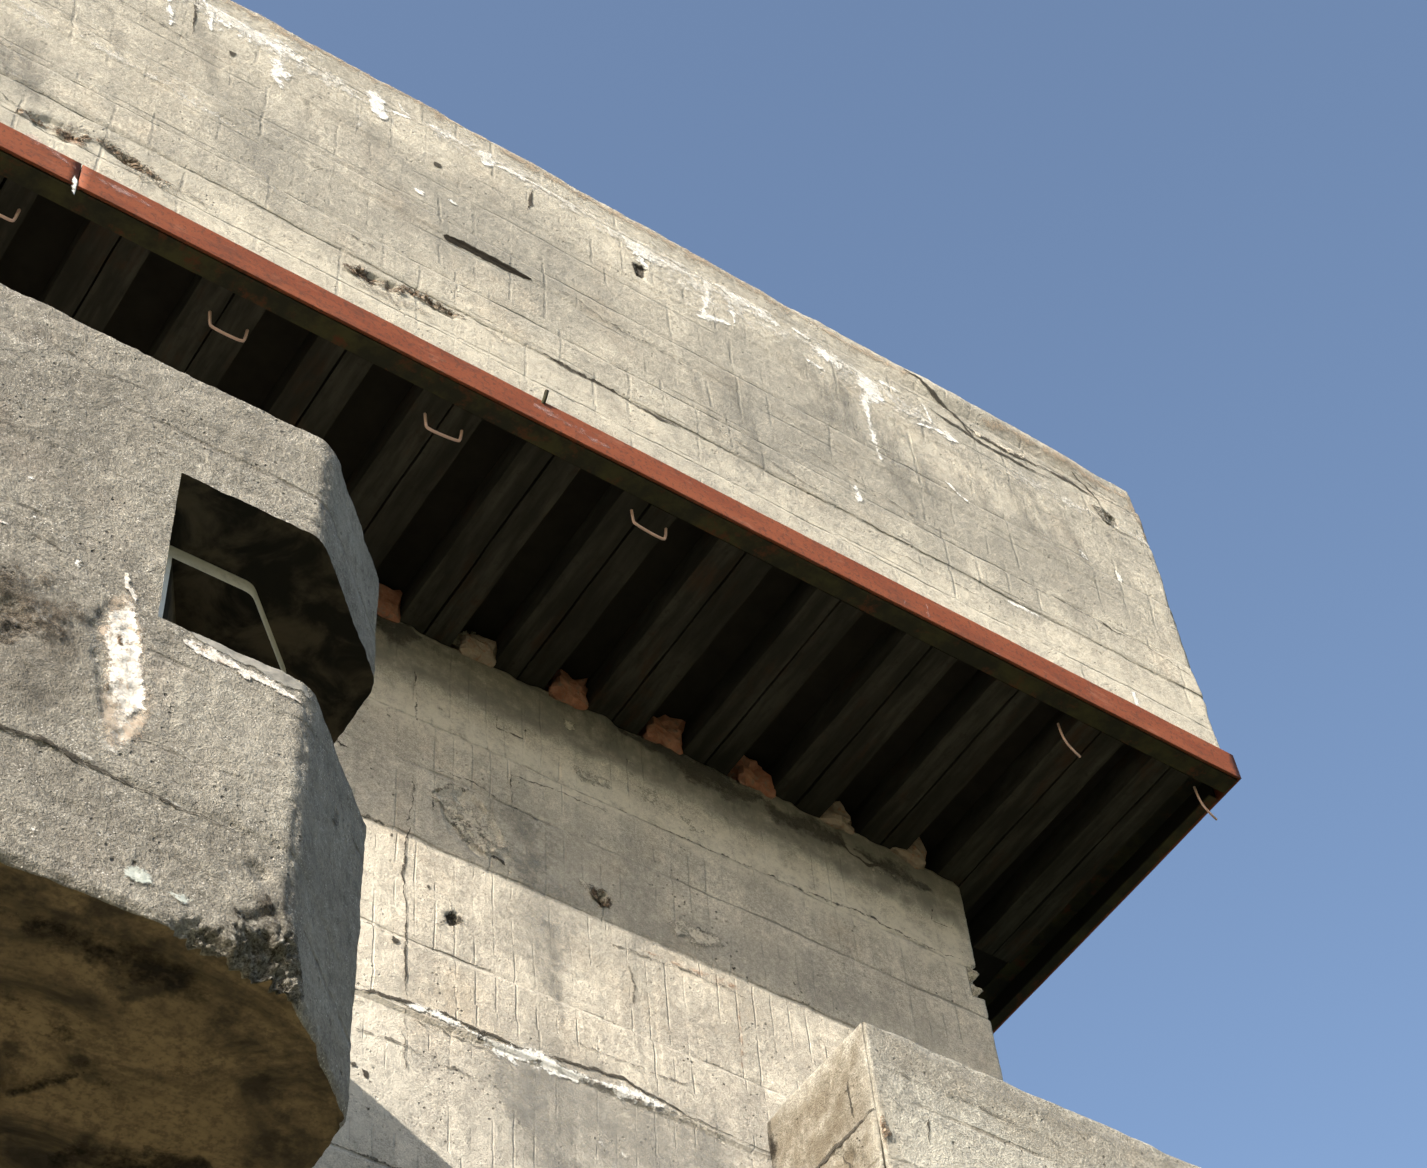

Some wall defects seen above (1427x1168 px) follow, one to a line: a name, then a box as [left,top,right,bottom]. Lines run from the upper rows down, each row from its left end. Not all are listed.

spalling [16,108,208,205]
spalling [342,263,470,321]
spalling [443,234,531,280]
crack [904,369,1110,498]
crack [0,723,235,831]
damp [22,920,201,995]
spalling [190,893,304,1008]
crack [354,771,960,1147]
damp [6,1074,76,1096]
damp [51,1145,210,1168]